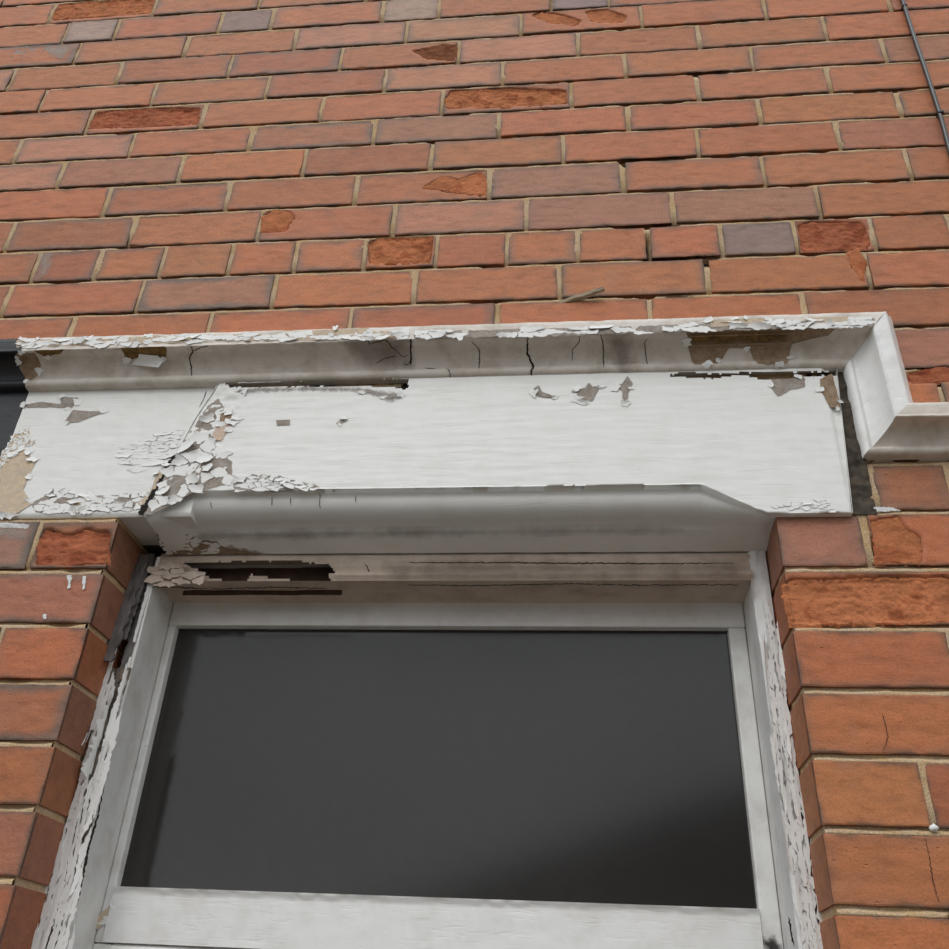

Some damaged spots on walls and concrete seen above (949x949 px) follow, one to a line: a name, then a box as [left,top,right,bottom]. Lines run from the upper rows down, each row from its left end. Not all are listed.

spalling [368,236,434,266]
crack [367,339,451,375]
peeling [15,315,877,411]
crack [526,337,535,375]
crack [572,335,604,367]
peeling [20,393,109,425]
crack [138,455,175,515]
peeling [0,399,319,520]
spalling [36,530,111,569]
peeling [144,531,261,588]
spalling [763,517,949,949]
peeling [31,662,128,949]